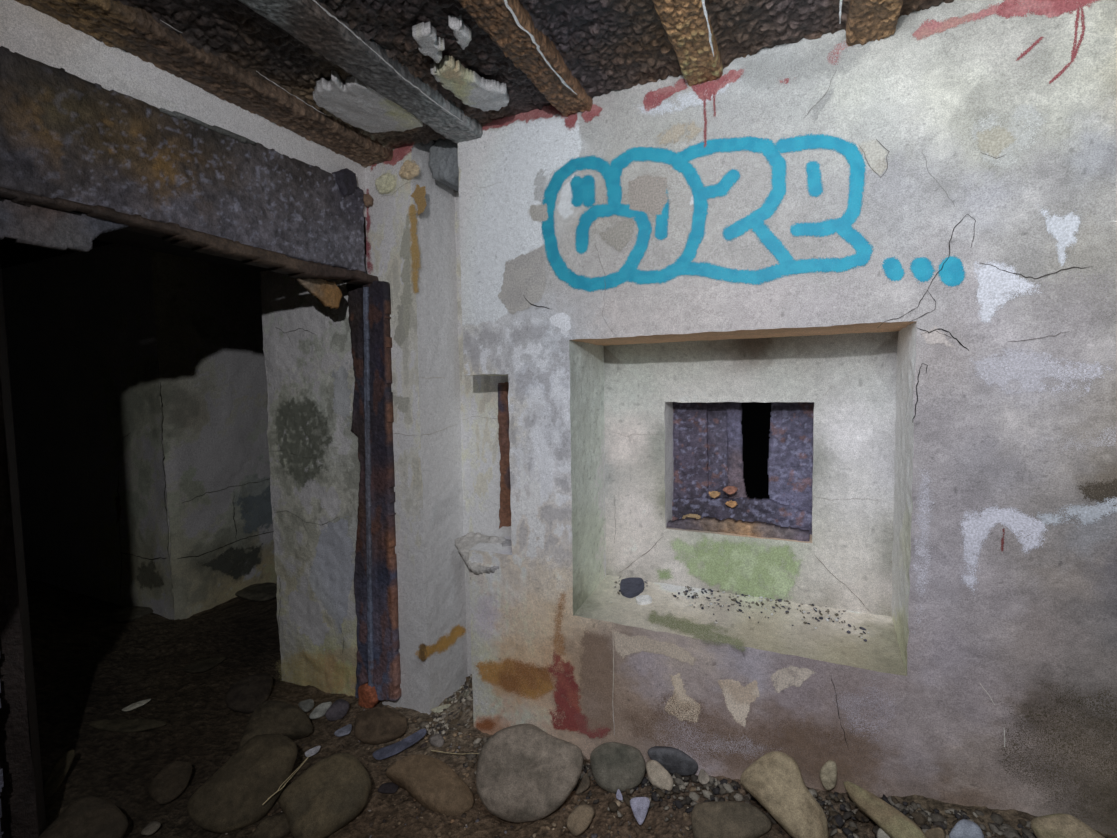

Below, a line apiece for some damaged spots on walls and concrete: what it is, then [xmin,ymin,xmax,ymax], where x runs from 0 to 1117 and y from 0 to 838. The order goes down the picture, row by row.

crack [883,153,1092,349]
crack [121,385,338,560]
damp [271,390,336,491]
rust [498,382,511,529]
rust [709,486,738,508]
crack [912,363,928,423]
rust [415,623,467,662]
rust [475,592,567,704]
spalling [718,665,815,726]
damp [994,675,1117,836]